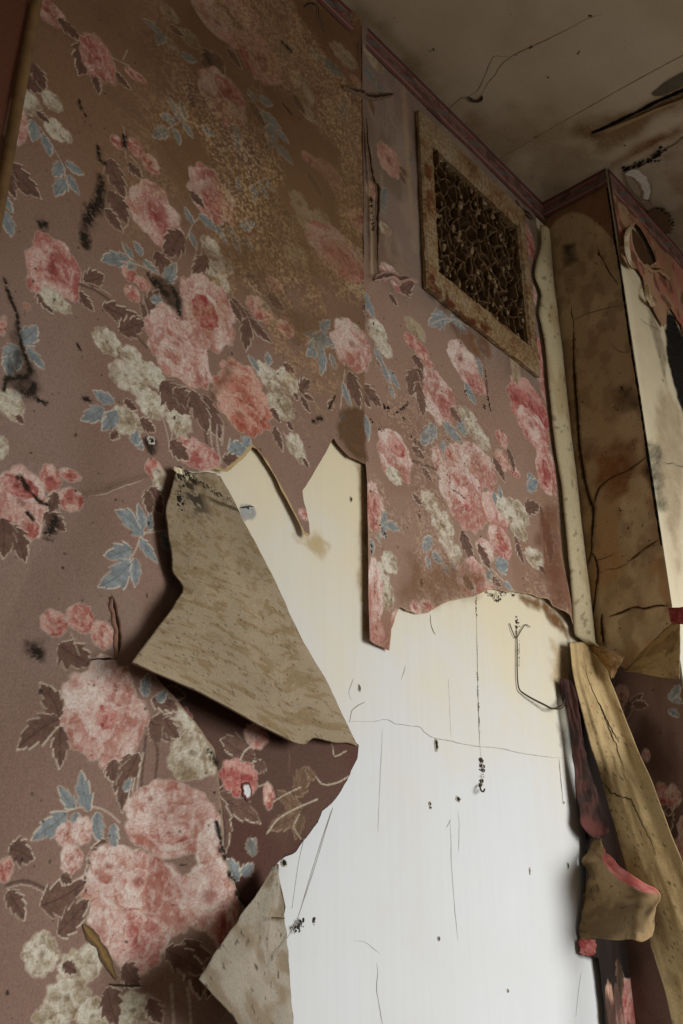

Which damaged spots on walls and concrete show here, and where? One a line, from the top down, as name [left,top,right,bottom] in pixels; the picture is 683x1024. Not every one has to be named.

crack [571,245,683,645]
leakage [632,229,652,265]
leakage [646,406,680,510]
peeling [131,460,359,1024]
peeling [560,607,683,1024]